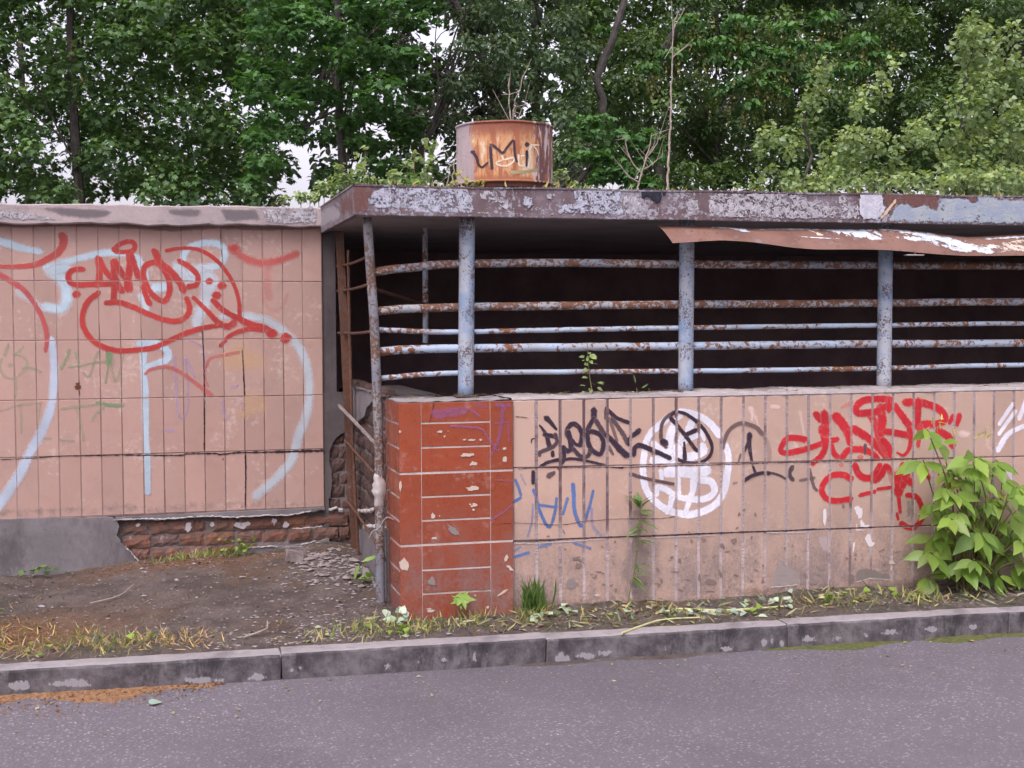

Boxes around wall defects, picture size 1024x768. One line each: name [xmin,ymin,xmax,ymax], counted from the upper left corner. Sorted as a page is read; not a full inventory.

peeling [368,185,533,215]
peeling [547,187,647,215]
peeling [685,191,1024,224]
crack [0,331,324,504]
spalling [113,379,402,561]